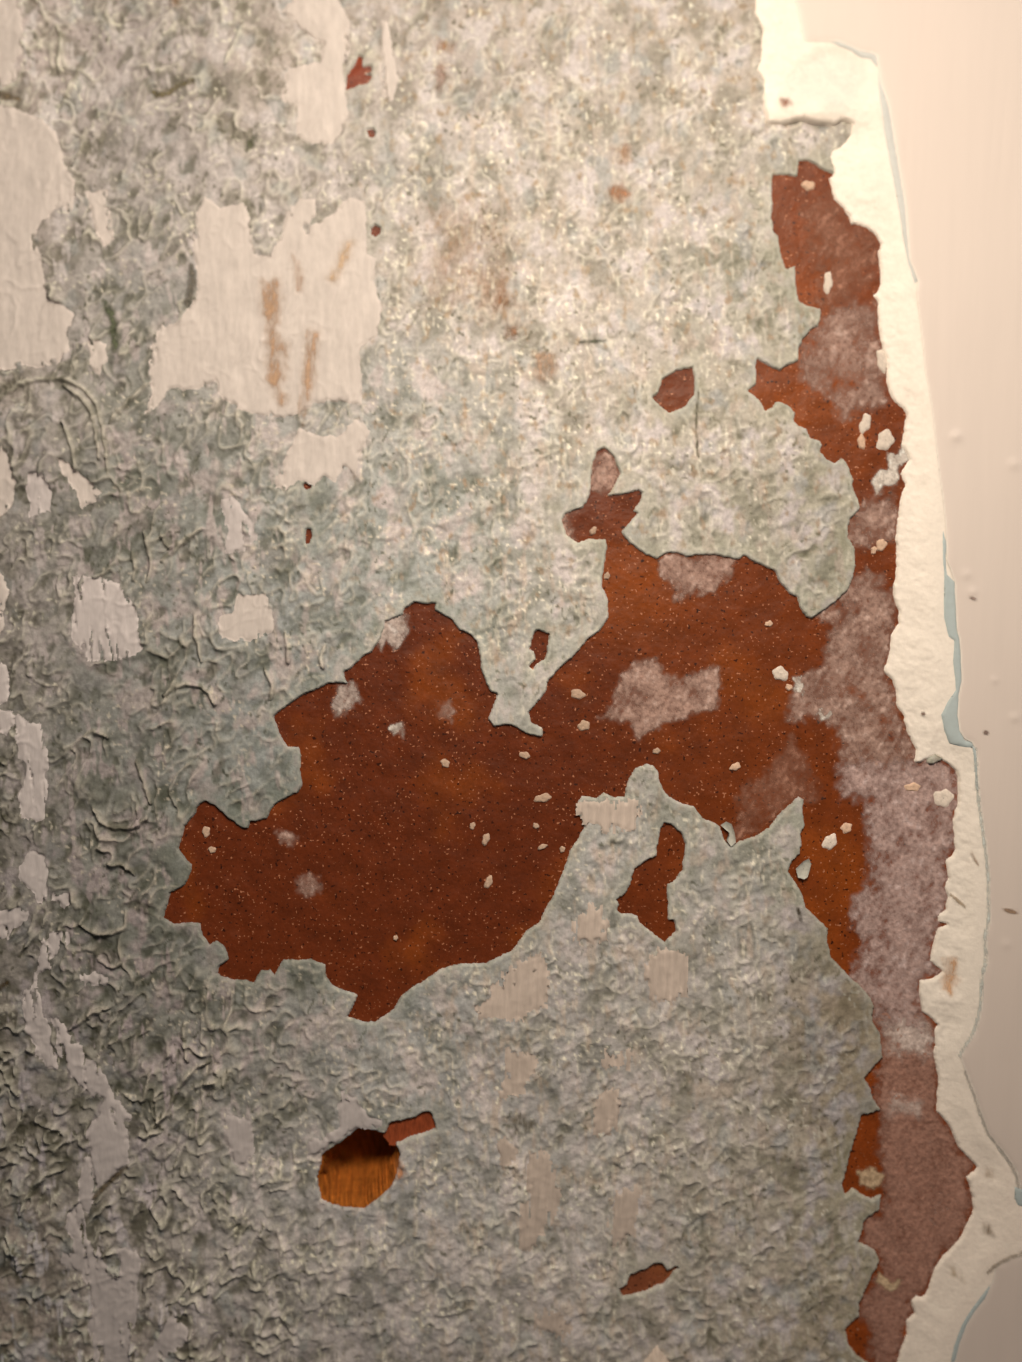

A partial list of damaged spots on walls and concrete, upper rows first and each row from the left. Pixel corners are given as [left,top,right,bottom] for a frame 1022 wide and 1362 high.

peeling [346,56,372,90]
corrosion [263,281,283,404]
corrosion [305,333,318,396]
peeling [164,161,958,1031]
flaking render [755,0,1022,1362]
spalling [382,1111,436,1146]
peeling [620,1263,677,1295]